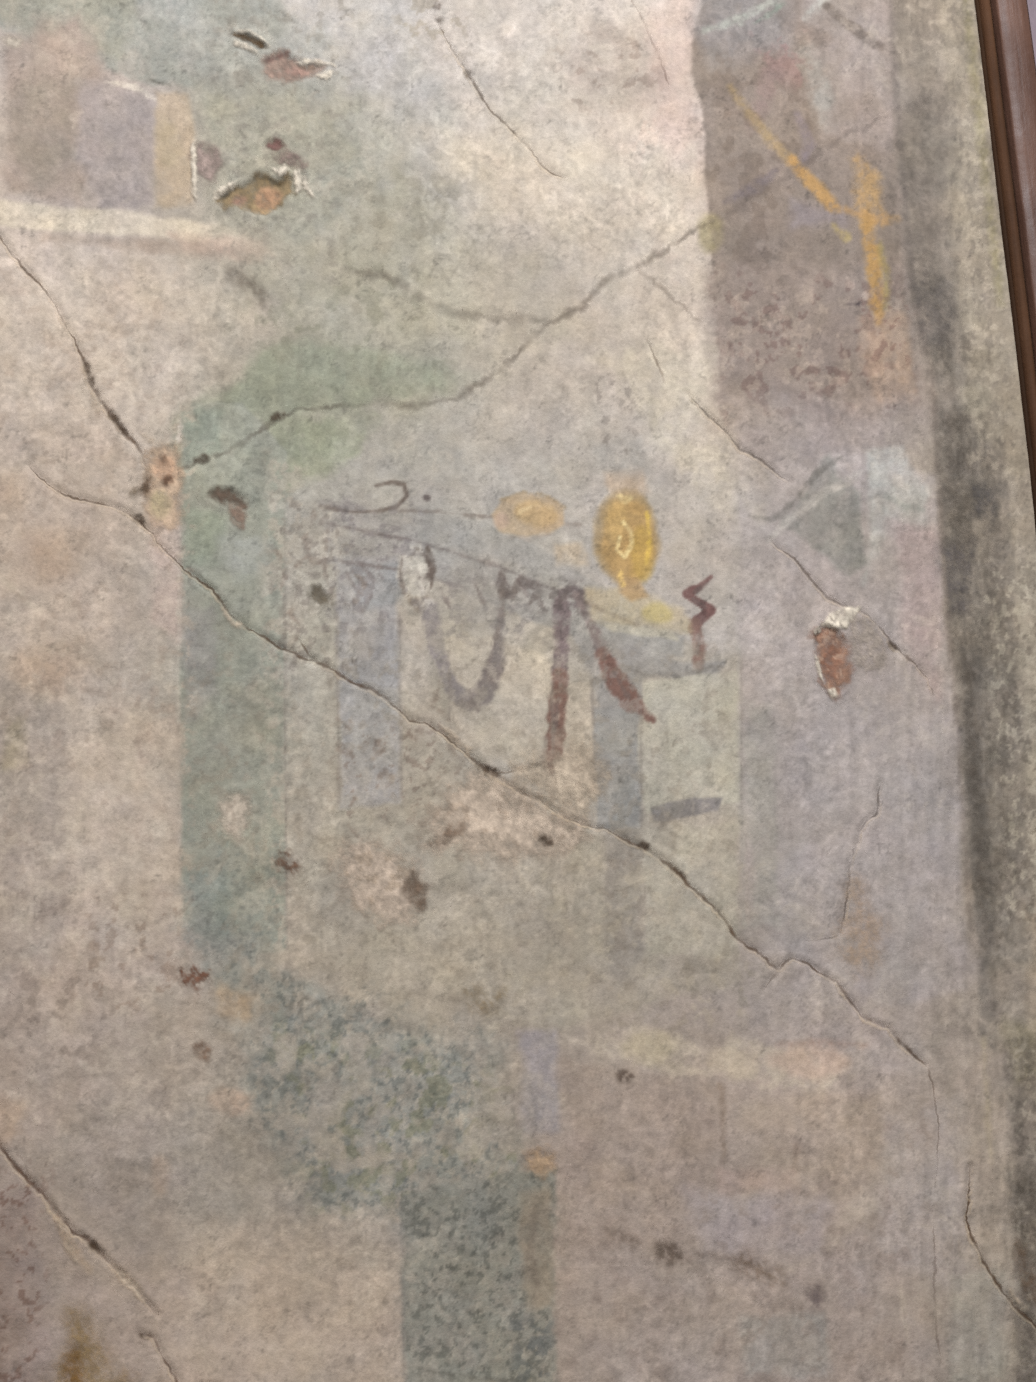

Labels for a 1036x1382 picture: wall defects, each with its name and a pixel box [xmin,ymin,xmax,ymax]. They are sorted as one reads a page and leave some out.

flaking render [234,30,332,82]
flaking render [191,139,314,214]
crack [74,338,152,444]
crack [136,515,376,692]
flaking render [814,606,886,696]
crack [426,723,530,797]
crack [541,817,768,961]
crack [2,1149,46,1198]
crack [65,1228,139,1295]
crack [966,1188,1036,1327]